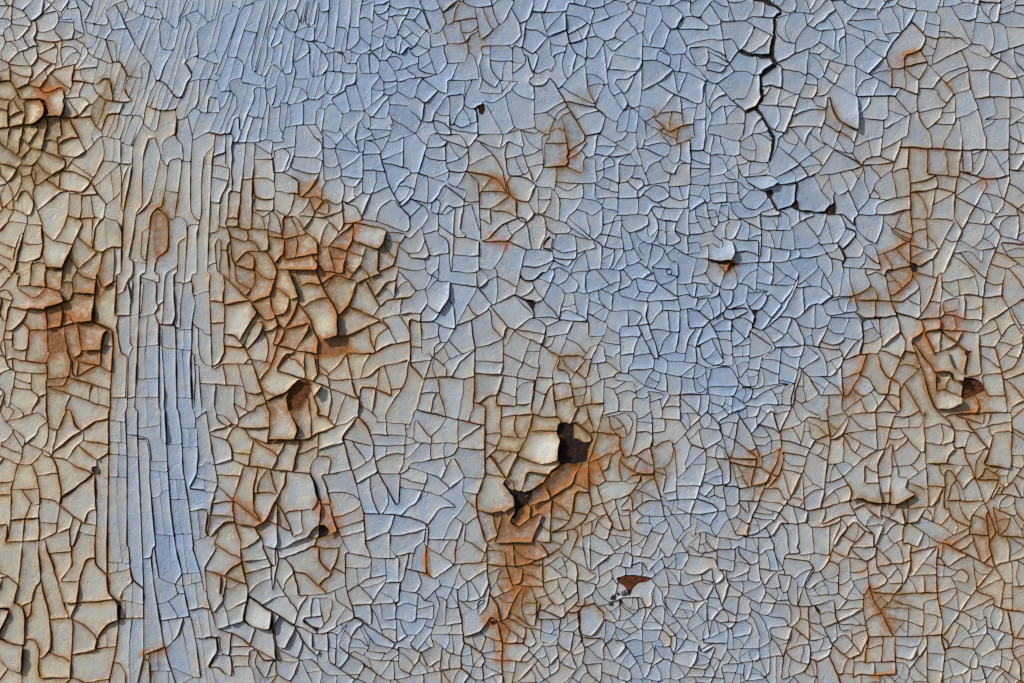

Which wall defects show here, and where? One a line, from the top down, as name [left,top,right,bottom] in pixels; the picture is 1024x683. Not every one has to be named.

crack [461,0,501,39]
rust [1,77,65,178]
rust [30,257,107,407]
crack [0,0,228,683]
peeling [260,346,321,439]
rust [226,217,391,368]
peeling [912,319,986,409]
peeling [477,416,591,543]
rust [483,424,663,663]
peeling [580,574,652,636]
crack [894,546,938,576]
crack [723,639,770,683]